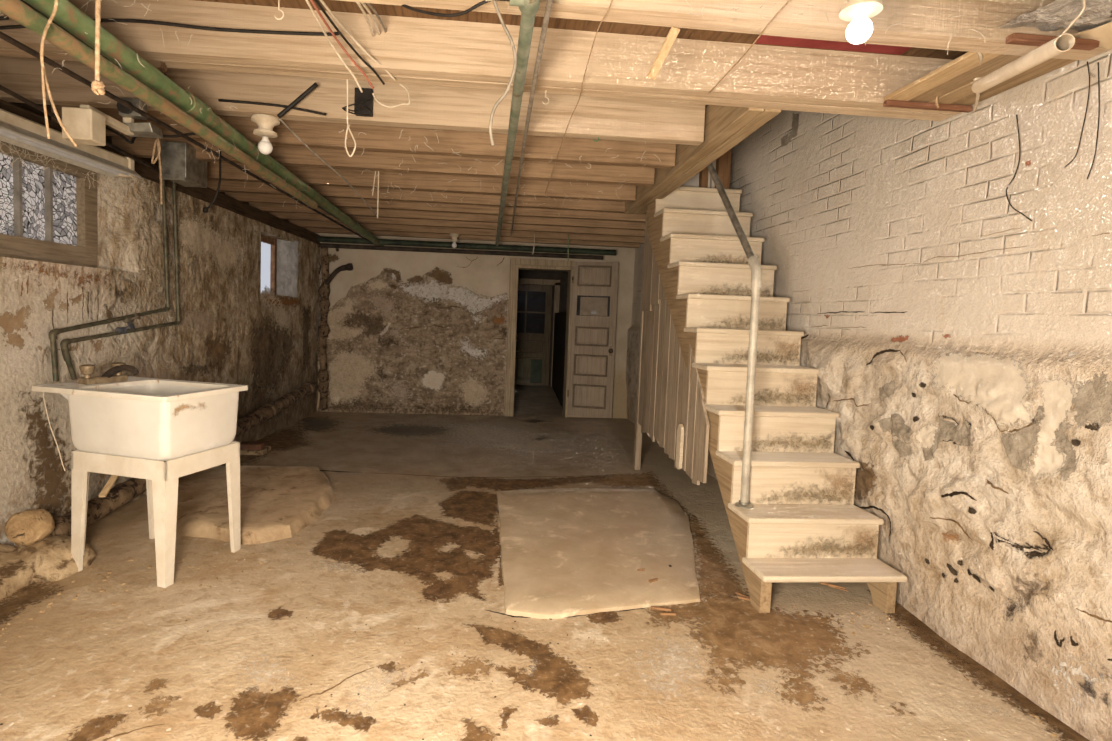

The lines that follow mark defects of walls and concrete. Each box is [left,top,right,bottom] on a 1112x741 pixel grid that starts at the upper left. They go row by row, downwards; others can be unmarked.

peeling [0,288,82,350]
damp [183,333,231,376]
damp [250,248,321,401]
flaking render [326,267,509,410]
peeling [870,347,1044,470]
spalling [1055,371,1112,481]
damp [295,398,610,603]
crack [930,479,1008,541]
spalling [942,560,994,592]